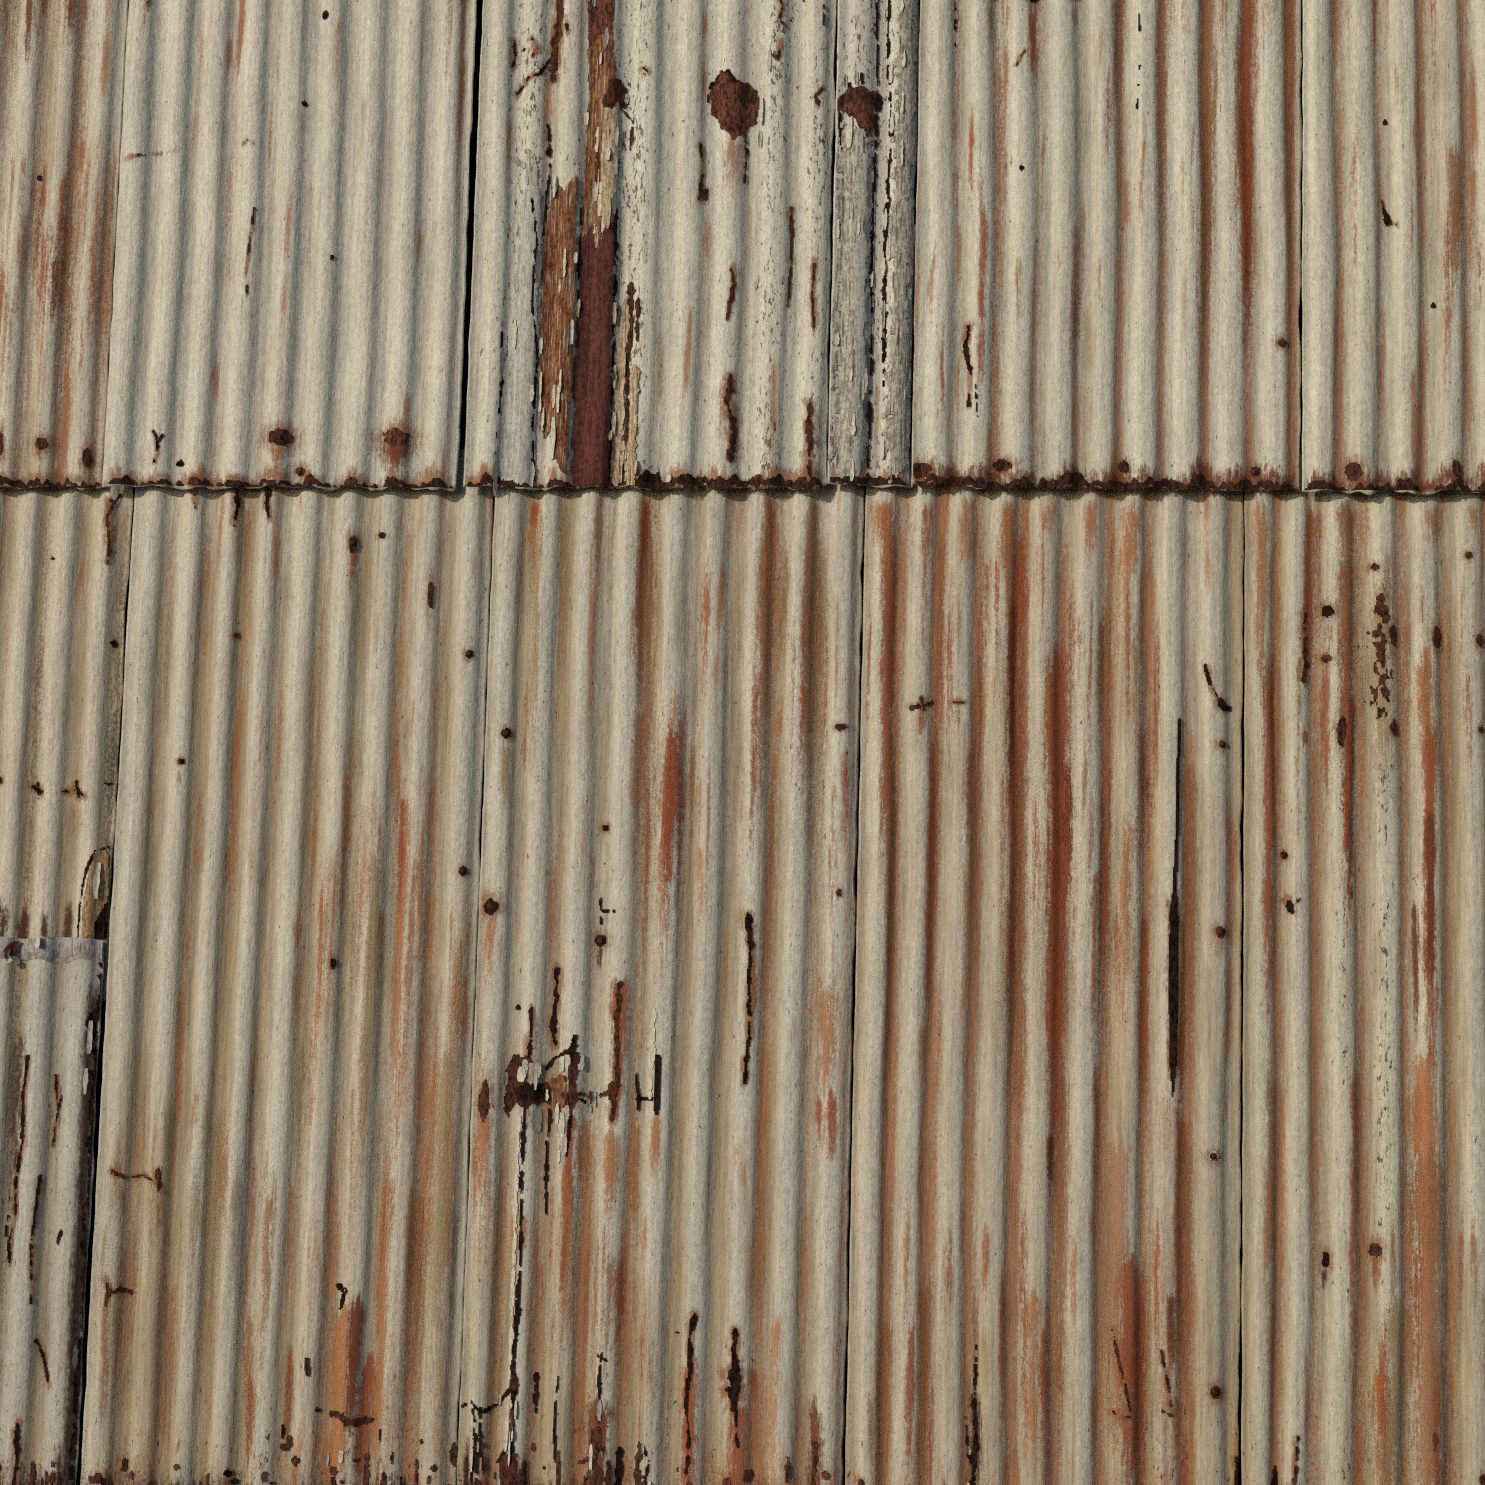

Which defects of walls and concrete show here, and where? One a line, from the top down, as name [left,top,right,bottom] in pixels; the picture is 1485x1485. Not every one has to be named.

corrosion [3,0,86,56]
corrosion [0,148,115,365]
peeling [493,0,640,496]
corrosion [954,115,983,213]
corrosion [1026,0,1039,77]
corrosion [1058,200,1101,377]
corrosion [1105,0,1123,183]
corrosion [1139,0,1167,212]
corrosion [1184,0,1295,351]
peeling [3,937,40,964]